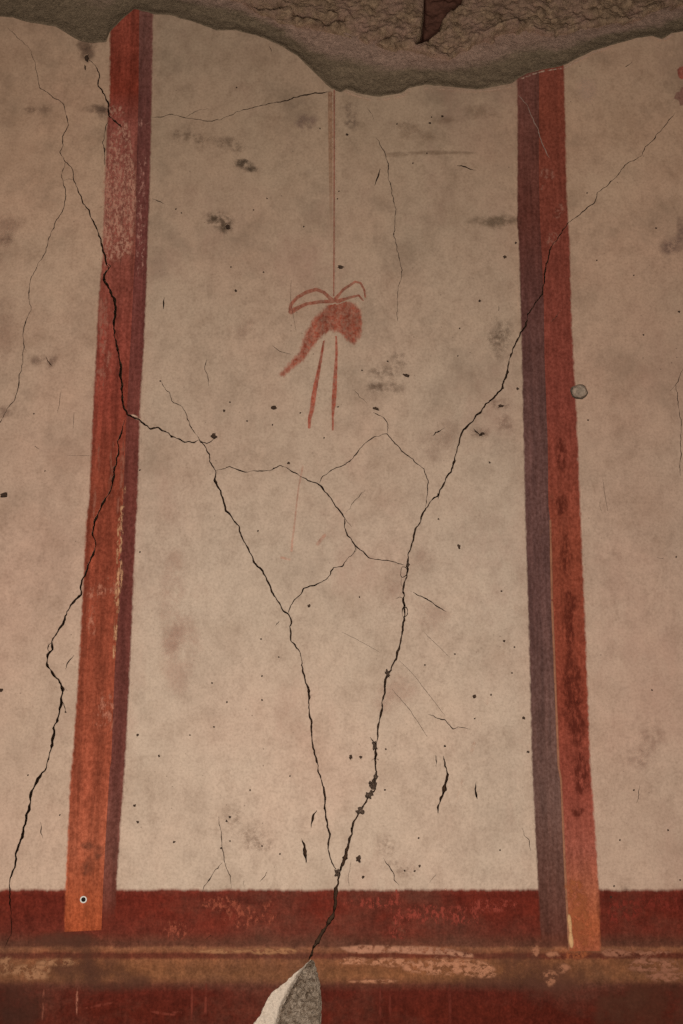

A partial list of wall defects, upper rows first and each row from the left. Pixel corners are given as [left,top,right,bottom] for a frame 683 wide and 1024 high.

flaking render [0,0,683,97]
crack [88,59,122,163]
crack [152,92,326,122]
crack [28,115,674,959]
crack [9,420,125,914]
spalling [254,960,322,1024]